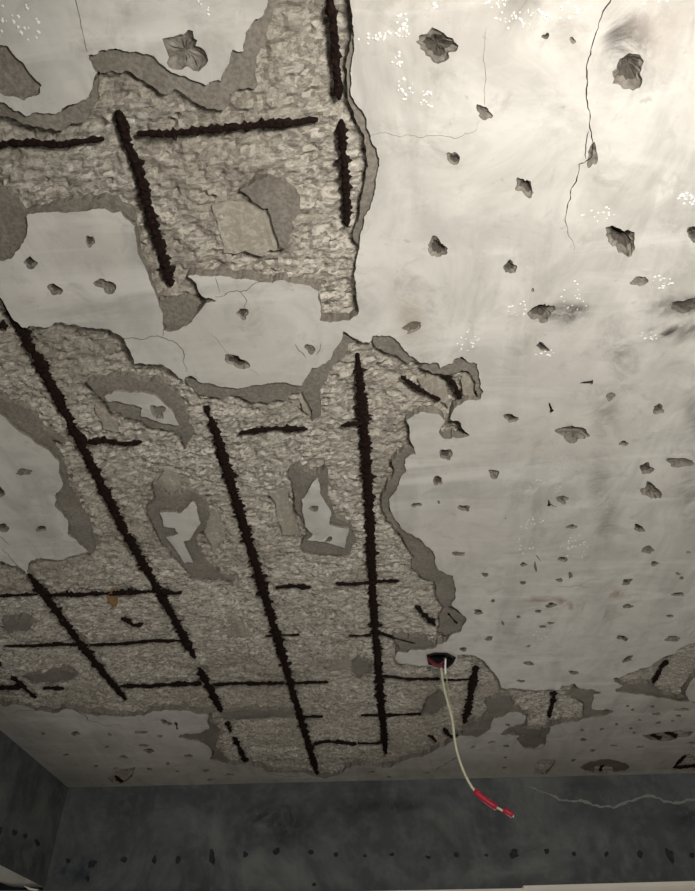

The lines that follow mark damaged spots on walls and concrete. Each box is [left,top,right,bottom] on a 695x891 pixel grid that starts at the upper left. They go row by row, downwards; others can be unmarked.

rust [0,135,105,149]
rust [114,109,318,286]
rust [324,0,344,100]
rust [335,119,354,227]
crack [373,47,486,139]
crack [565,0,611,250]
spalling [606,225,635,257]
spalling [612,53,644,91]
spalling [0,0,629,784]
spalling [640,462,662,499]
rust [0,298,480,775]
spalling [614,636,695,771]